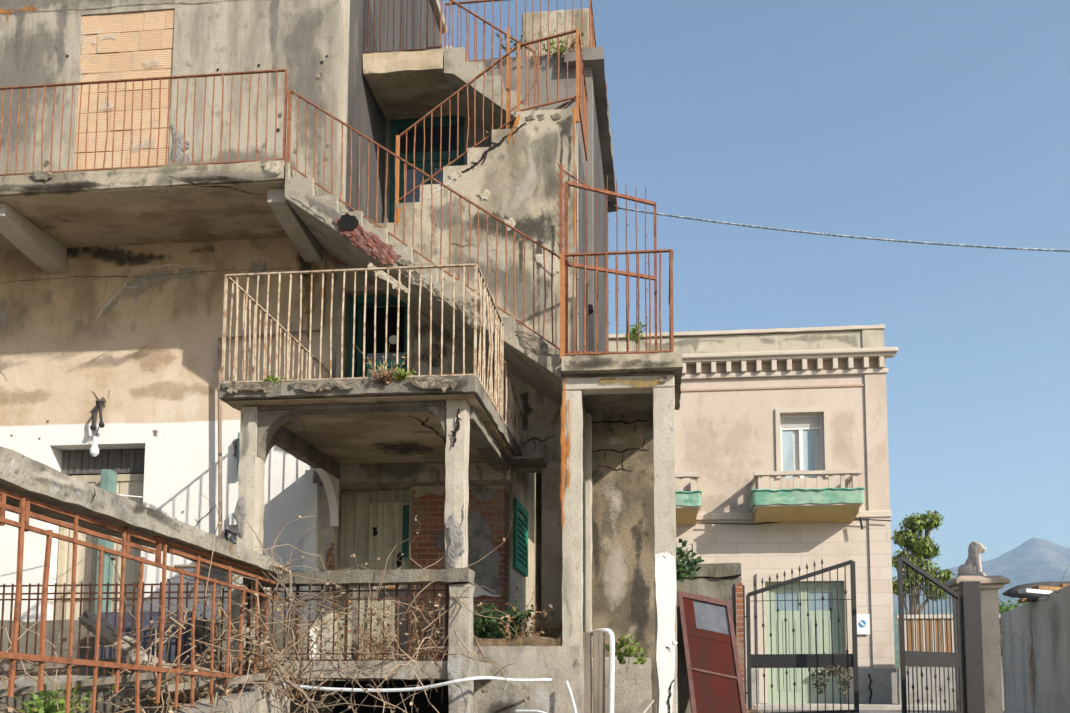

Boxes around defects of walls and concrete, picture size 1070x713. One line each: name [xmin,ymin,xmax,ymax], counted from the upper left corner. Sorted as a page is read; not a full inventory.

leakage [0,0,78,144]
leakage [270,0,326,149]
spalling [525,112,562,121]
spalling [170,124,192,164]
leakage [67,247,163,266]
spalling [333,213,483,330]
crack [410,408,461,447]
crack [592,420,649,471]
peeling [435,485,502,597]
leakage [592,519,650,640]
crack [667,680,675,713]